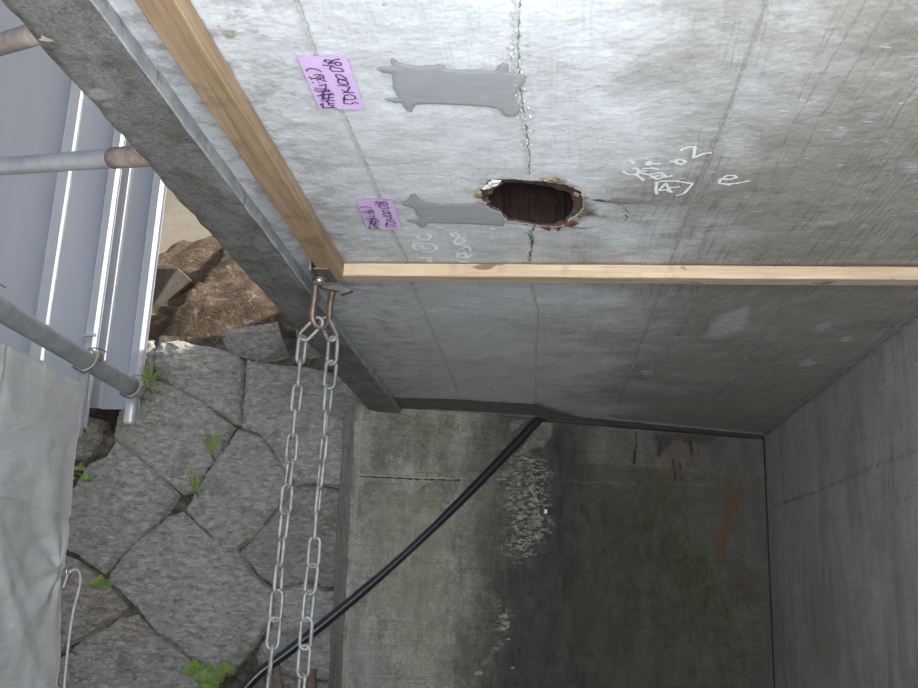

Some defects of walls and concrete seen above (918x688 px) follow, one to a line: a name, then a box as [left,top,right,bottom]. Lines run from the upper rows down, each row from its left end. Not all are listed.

crack [506,0,534,175]
crack [525,215,540,261]
spalling [475,177,647,231]
water stain [502,438,573,593]